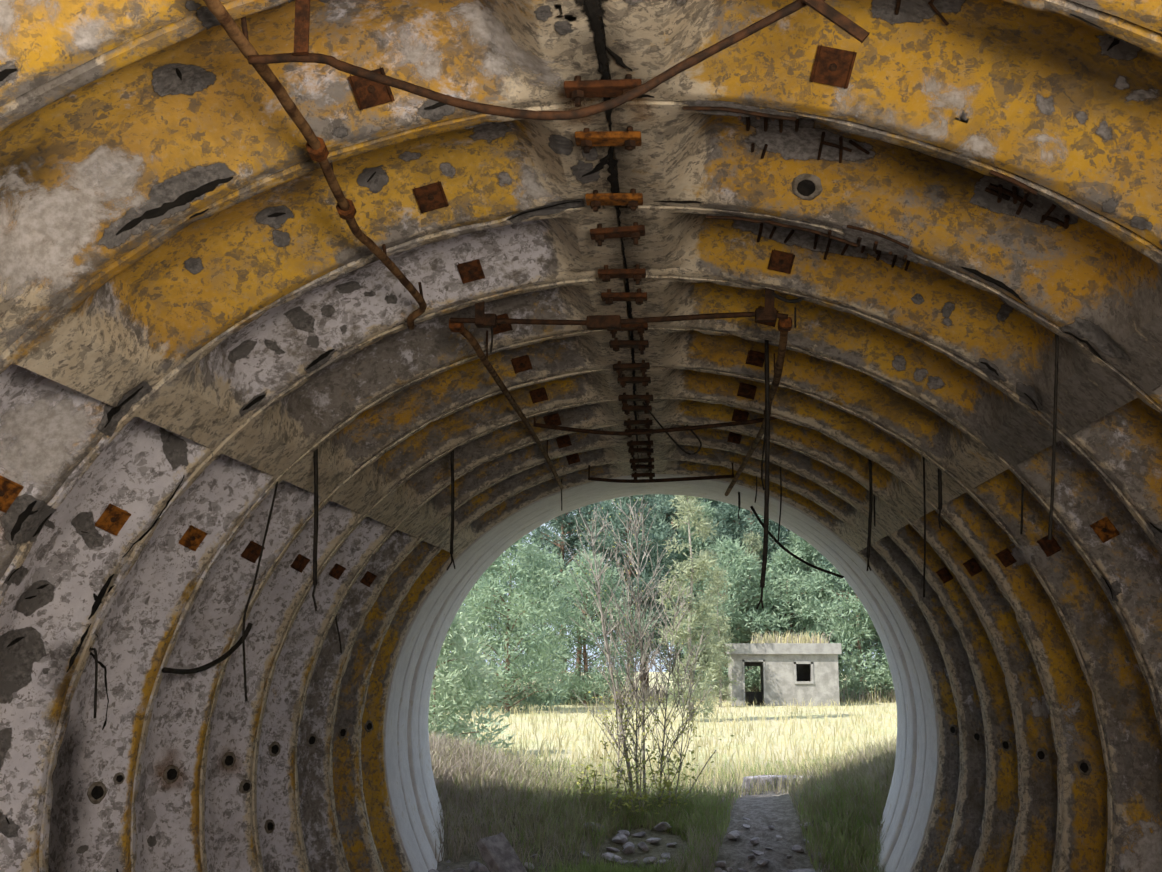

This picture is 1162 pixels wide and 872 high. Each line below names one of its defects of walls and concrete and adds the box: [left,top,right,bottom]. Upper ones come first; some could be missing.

peeling [0,0,57,87]
peeling [75,20,104,49]
spalling [870,0,965,26]
spalling [151,63,217,97]
spalling [683,100,876,163]
peeling [911,80,973,141]
peeling [1035,94,1055,116]
peeling [1075,110,1112,142]
spalling [959,134,1079,229]
peeling [0,146,235,300]
peeling [0,382,152,553]
spalling [0,566,55,704]